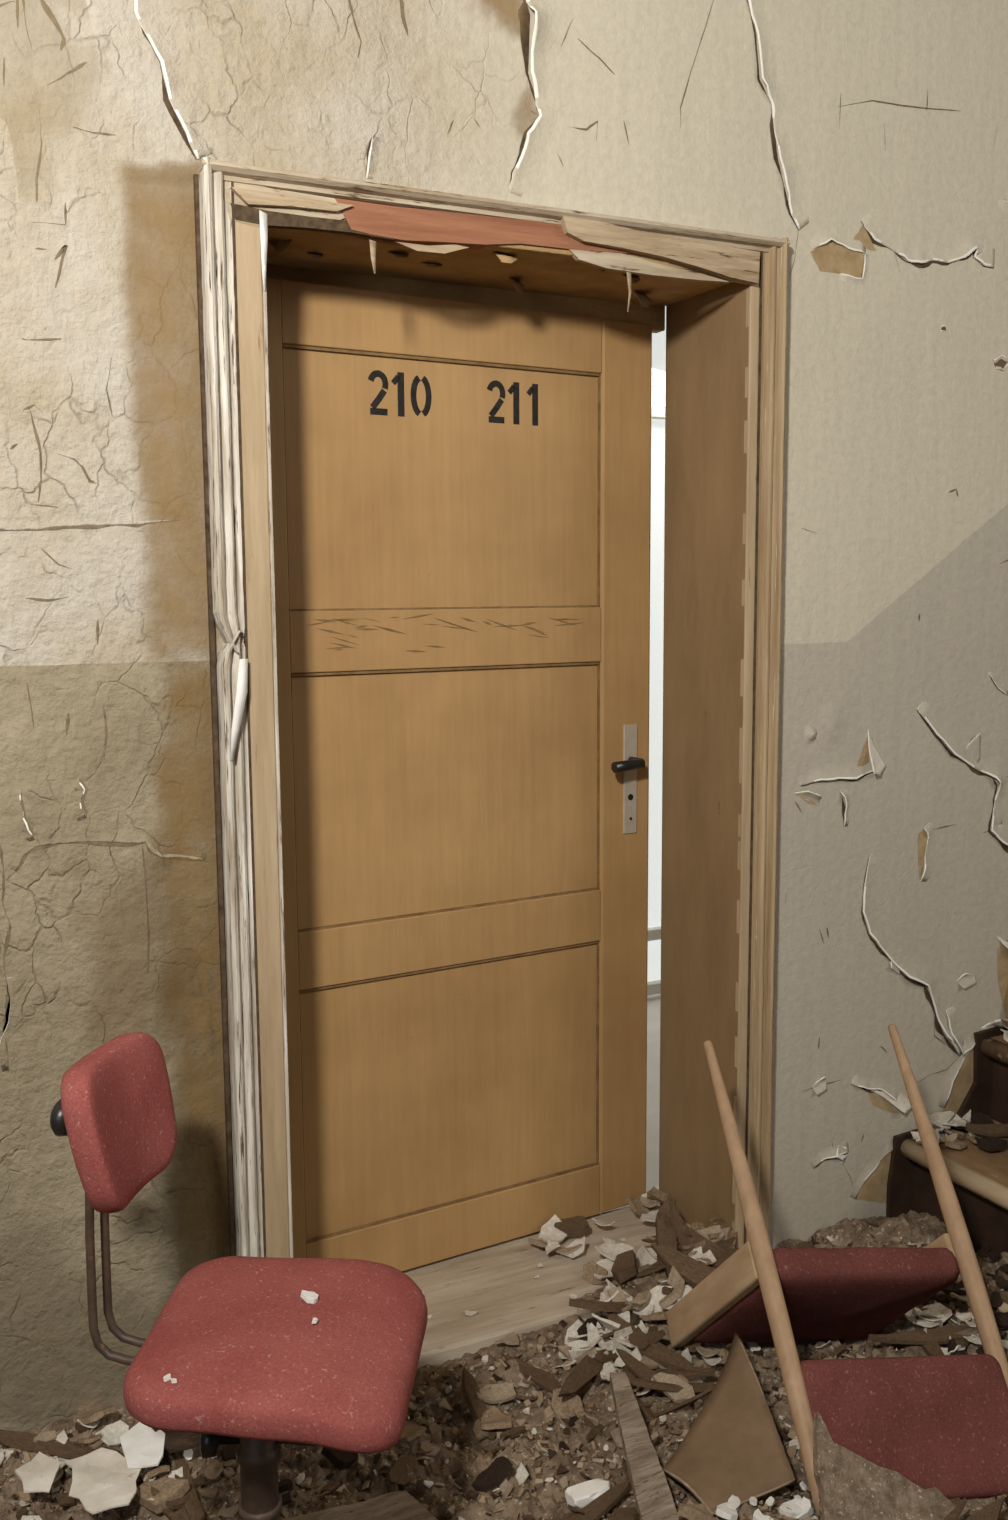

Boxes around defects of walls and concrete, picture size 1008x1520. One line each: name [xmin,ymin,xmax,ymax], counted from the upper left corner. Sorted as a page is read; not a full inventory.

crack [134,0,216,159]
crack [485,0,629,197]
crack [680,0,995,274]
flaking render [810,226,876,285]
peeling [793,729,887,827]
crack [917,701,1008,853]
flaking render [802,935,1008,1144]
crack [861,853,979,1083]
flaking render [811,1139,893,1203]